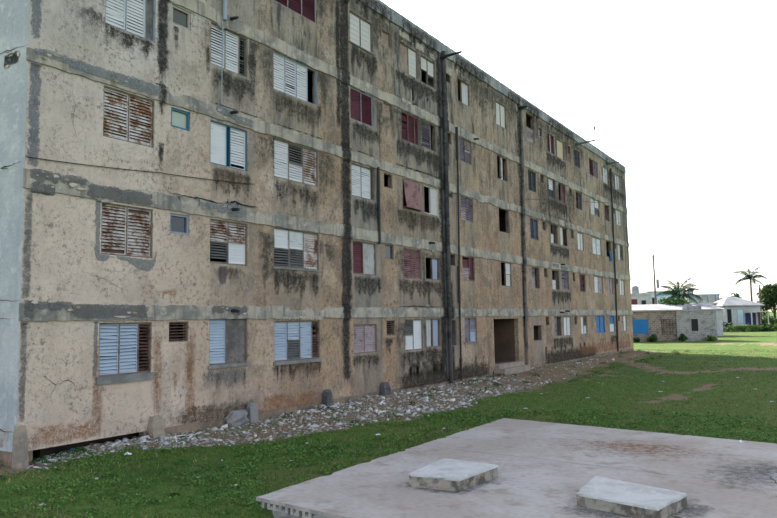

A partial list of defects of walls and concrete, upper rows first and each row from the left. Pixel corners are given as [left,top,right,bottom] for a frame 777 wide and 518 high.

flaking render [31,0,42,38]
water stain [83,0,179,112]
water stain [206,42,273,100]
water stain [215,169,250,193]
water stain [274,0,489,389]
water stain [455,61,582,342]
spalling [19,48,161,420]
water stain [219,266,238,285]
water stain [260,234,318,294]